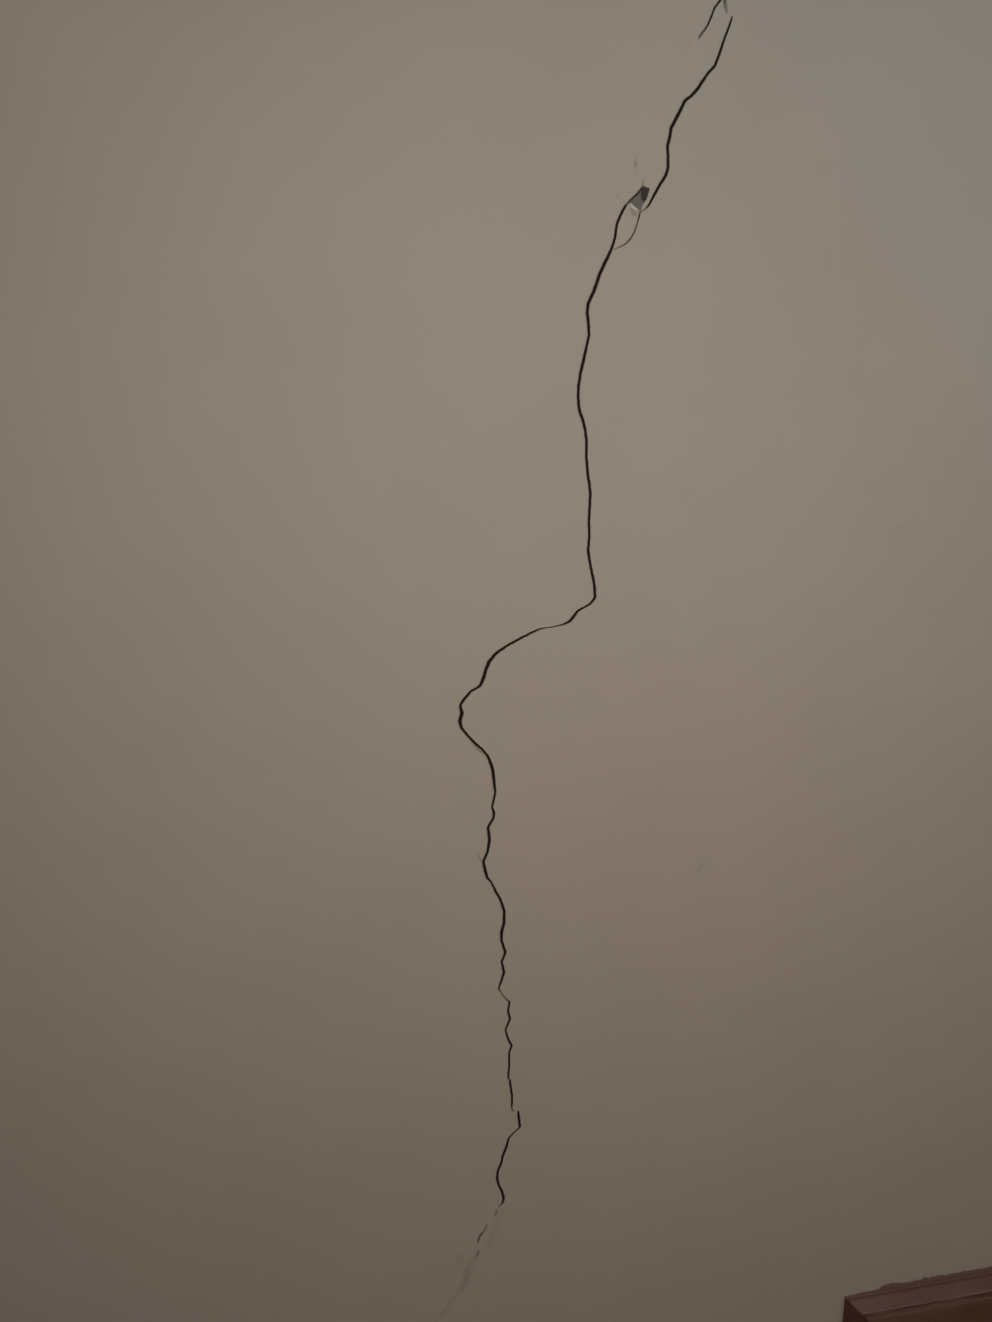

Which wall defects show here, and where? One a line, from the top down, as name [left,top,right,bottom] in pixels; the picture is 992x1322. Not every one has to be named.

crack [456,0,735,1241]